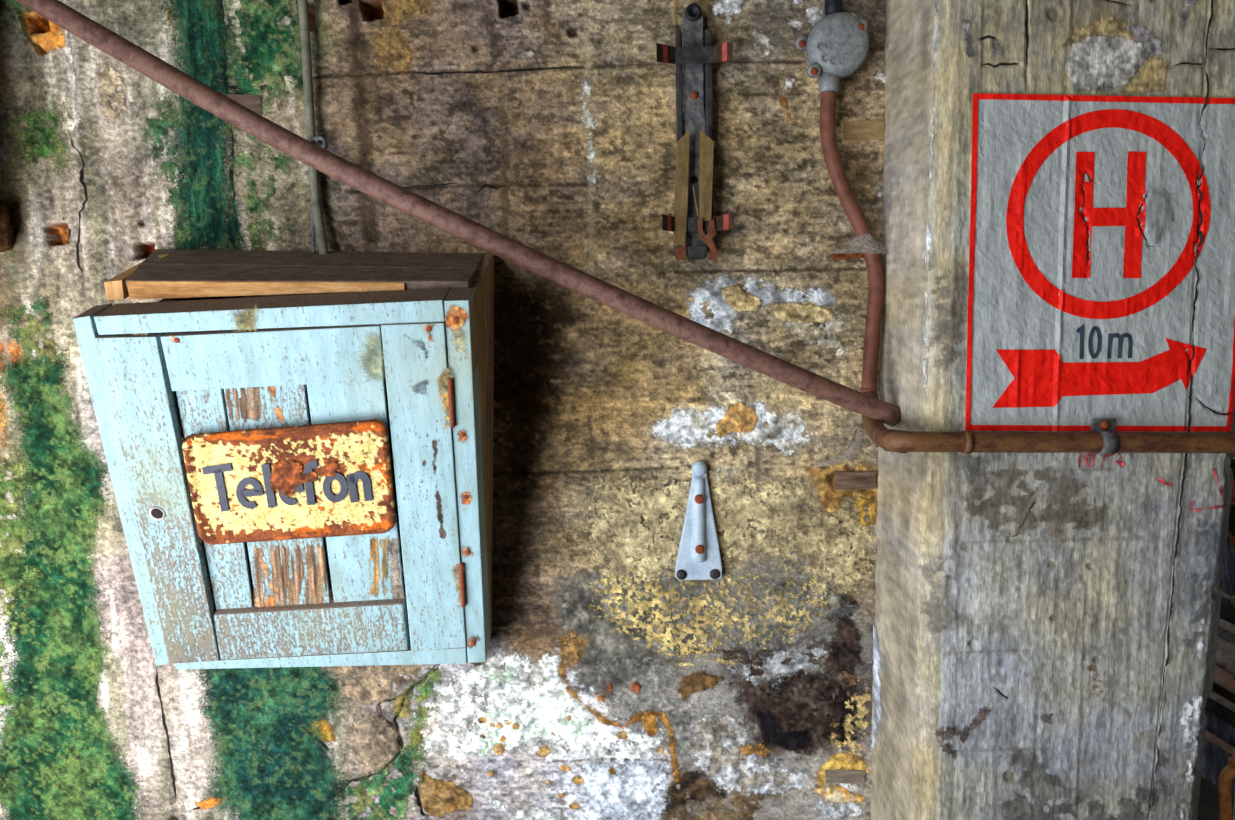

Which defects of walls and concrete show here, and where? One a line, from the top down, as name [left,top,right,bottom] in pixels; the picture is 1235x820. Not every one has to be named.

peeling [961,20,975,57]
spalling [1055,3,1167,94]
crack [63,135,88,291]
efflorescence [686,272,858,357]
efflorescence [651,382,816,456]
crack [1150,0,1235,812]
leakage [413,570,881,820]
rust [678,671,723,701]
rust [477,716,520,756]
rust [536,733,555,758]
rust [545,764,584,810]
rust [740,744,770,758]